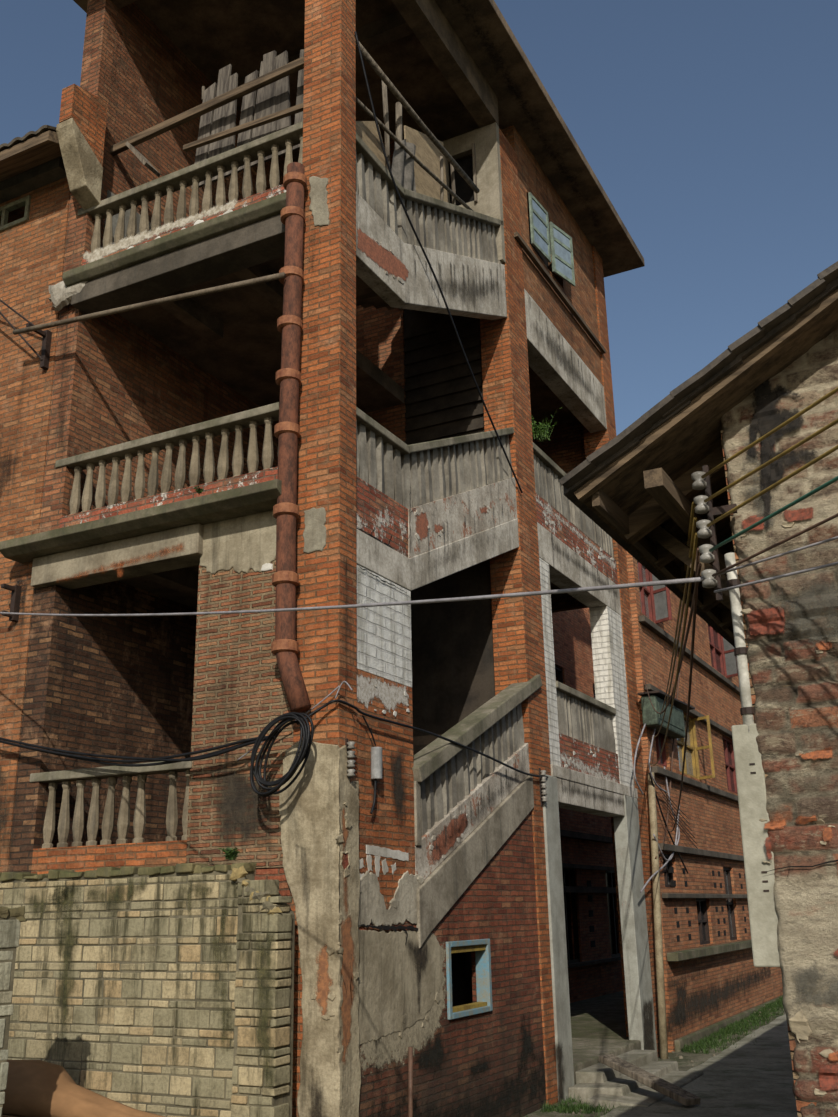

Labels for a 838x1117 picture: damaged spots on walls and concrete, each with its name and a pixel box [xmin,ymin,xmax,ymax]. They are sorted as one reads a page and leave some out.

peeling [357,229,409,284]
damp [747,414,771,529]
peeling [414,509,444,540]
peeling [536,496,617,569]
peeling [357,675,410,717]
spalling [814,1049,838,1095]